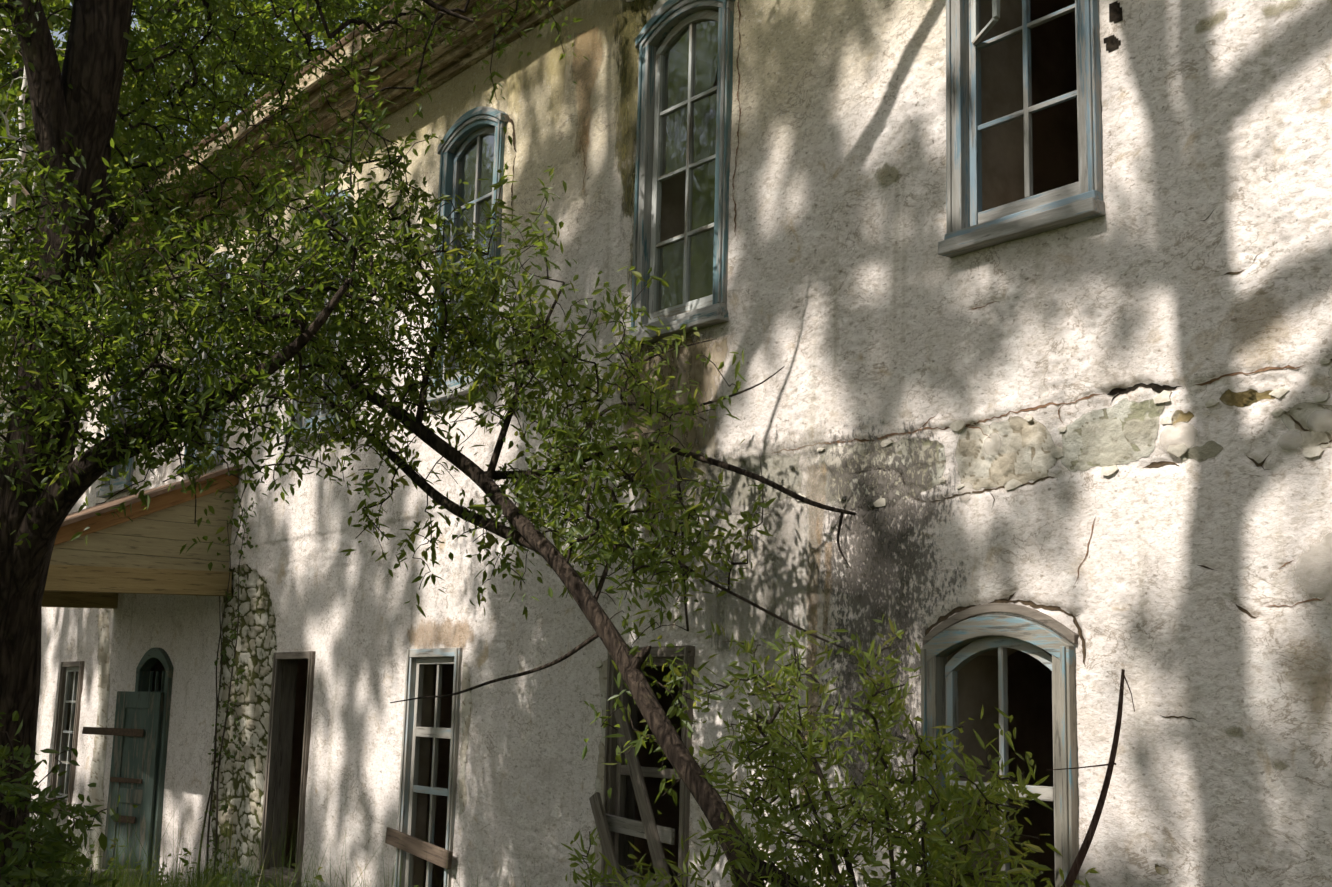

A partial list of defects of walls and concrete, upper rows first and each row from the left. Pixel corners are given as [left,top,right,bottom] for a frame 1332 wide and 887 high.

leakage [614,5,636,290]
spalling [683,388,1332,508]
crack [774,359,1332,527]
leakage [802,422,966,818]